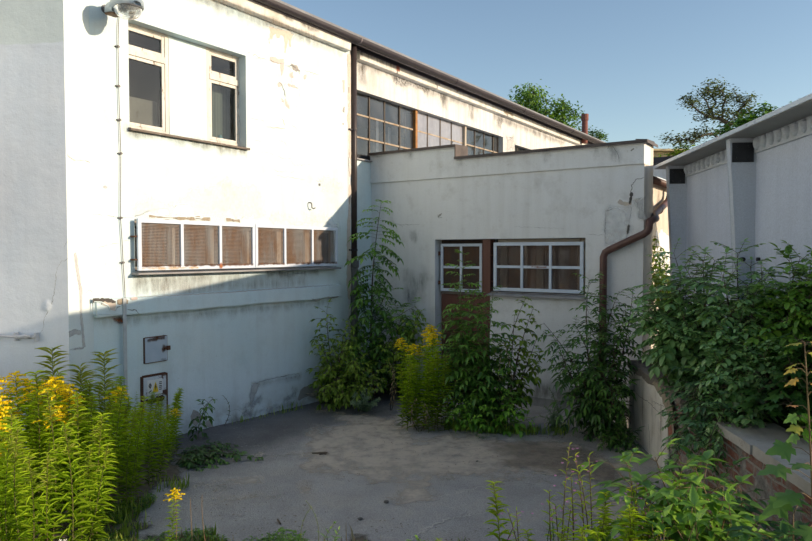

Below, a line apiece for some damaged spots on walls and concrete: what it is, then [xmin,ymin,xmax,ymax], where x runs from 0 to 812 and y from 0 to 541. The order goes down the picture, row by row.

peeling [248,25,317,110]
flaking render [148,214,212,222]
flaking render [93,297,138,315]